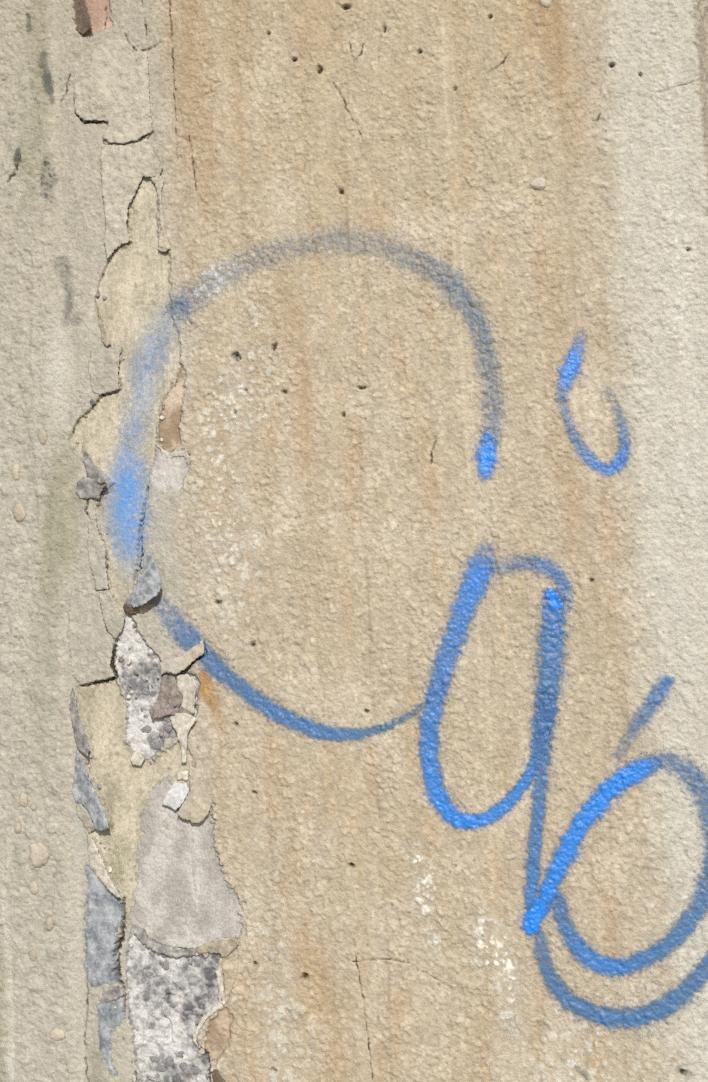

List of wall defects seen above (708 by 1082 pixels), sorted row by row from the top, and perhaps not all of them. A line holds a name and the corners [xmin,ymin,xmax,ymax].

peeling [72,0,113,37]
peeling [67,177,246,1082]